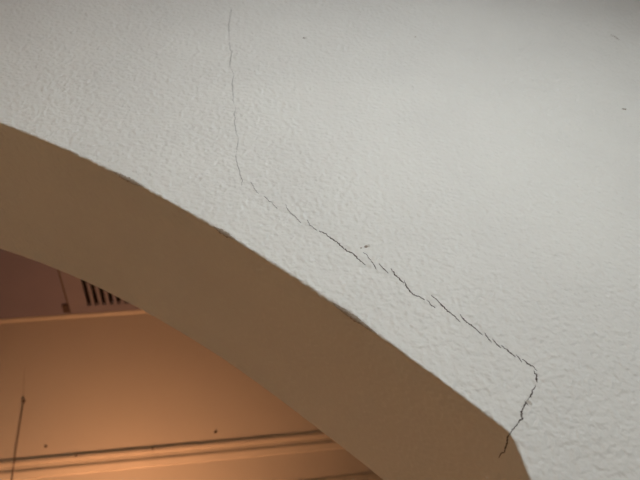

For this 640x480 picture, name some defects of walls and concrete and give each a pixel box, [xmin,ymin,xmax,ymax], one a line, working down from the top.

crack [228,12,538,457]